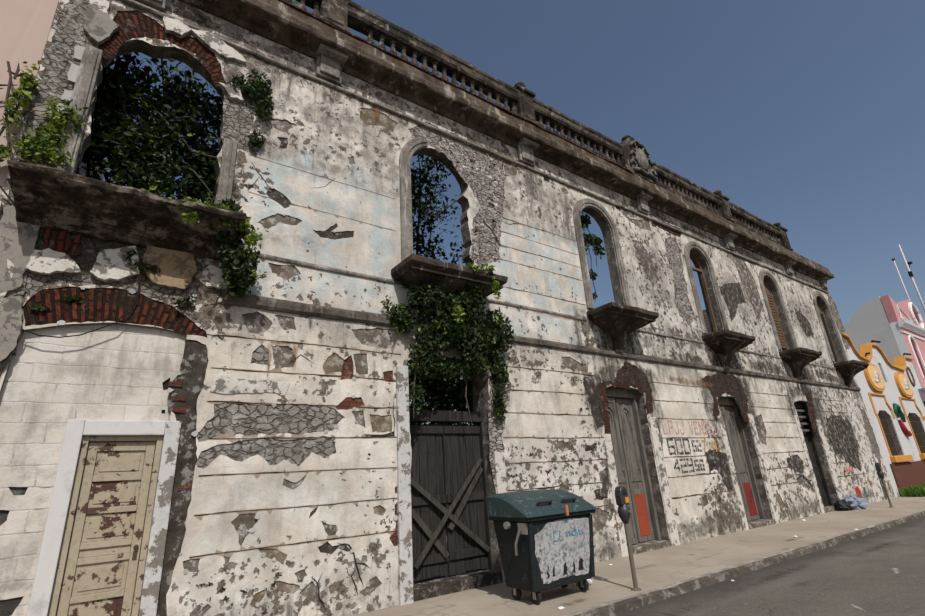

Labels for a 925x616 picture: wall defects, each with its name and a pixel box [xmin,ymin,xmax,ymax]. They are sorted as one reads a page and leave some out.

spalling [358,108,397,132]
flaking render [409,122,518,266]
flaking render [23,227,210,305]
spalling [323,327,392,381]
flaking render [167,372,186,413]
damp [702,352,783,435]
spalling [191,395,394,469]
spalling [282,475,306,489]